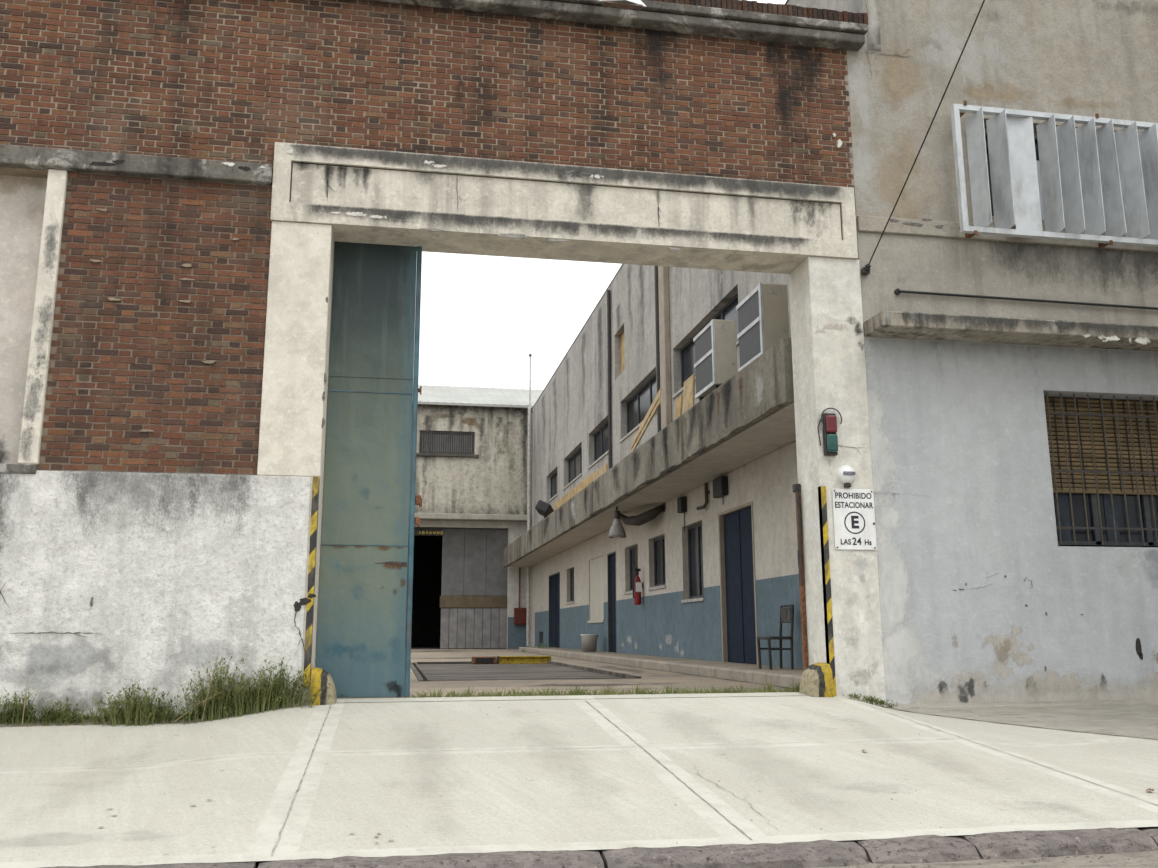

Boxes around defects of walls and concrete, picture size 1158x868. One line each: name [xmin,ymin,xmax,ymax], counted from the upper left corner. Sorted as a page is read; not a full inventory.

water stain [292,145,840,219]
water stain [312,205,806,247]
water stain [902,313,1158,333]
peeling [1085,334,1150,344]
water stain [412,405,528,473]
water stain [73,470,250,517]
peeling [984,625,1033,679]